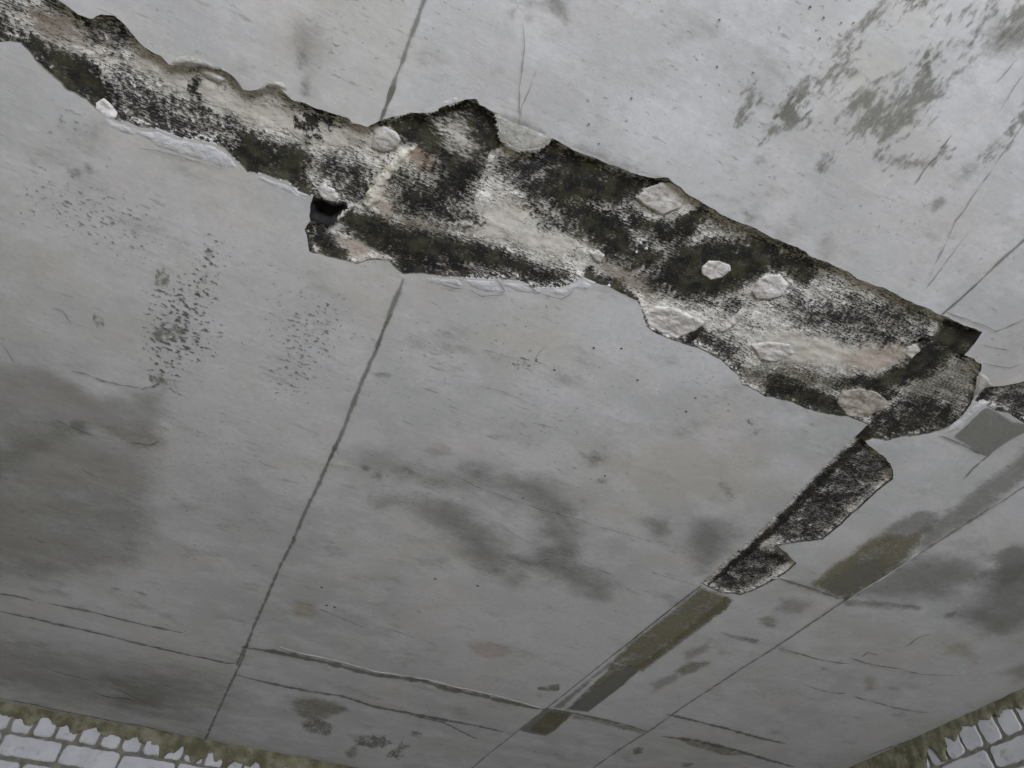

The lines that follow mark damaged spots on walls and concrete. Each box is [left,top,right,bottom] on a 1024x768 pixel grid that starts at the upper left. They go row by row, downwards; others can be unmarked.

damp [1000,6,1024,37]
damp [761,59,857,144]
damp [849,51,943,159]
crack [927,126,1023,287]
damp [143,234,223,393]
spalling [0,0,1024,595]
damp [815,534,919,598]
damp [521,589,731,735]